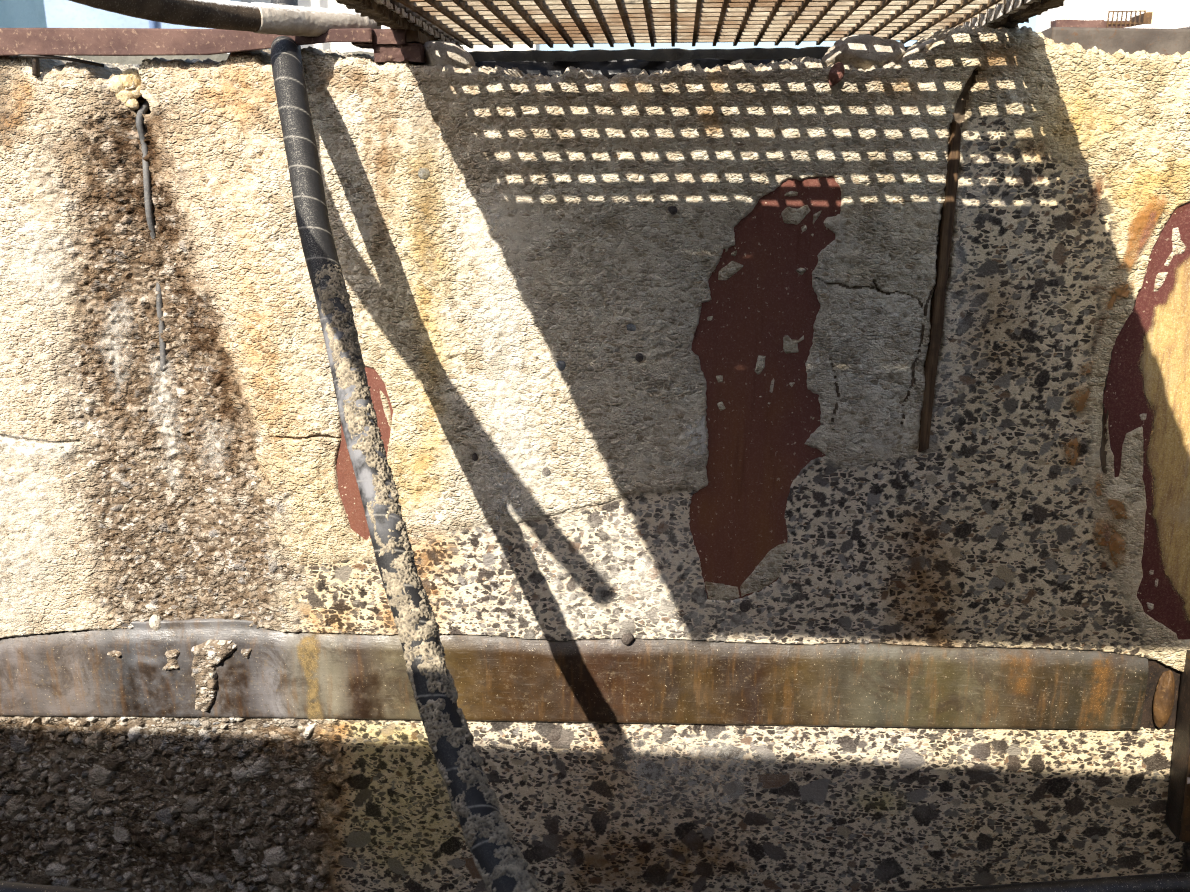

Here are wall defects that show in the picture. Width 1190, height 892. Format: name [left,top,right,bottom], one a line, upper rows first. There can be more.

crack [948,68,979,147]
crack [815,207,950,430]
rust [1088,196,1166,347]
peeling [336,424,371,540]
peeling [365,367,393,459]
peeling [450,176,841,640]
peeling [1103,202,1190,640]
rust [298,633,322,720]